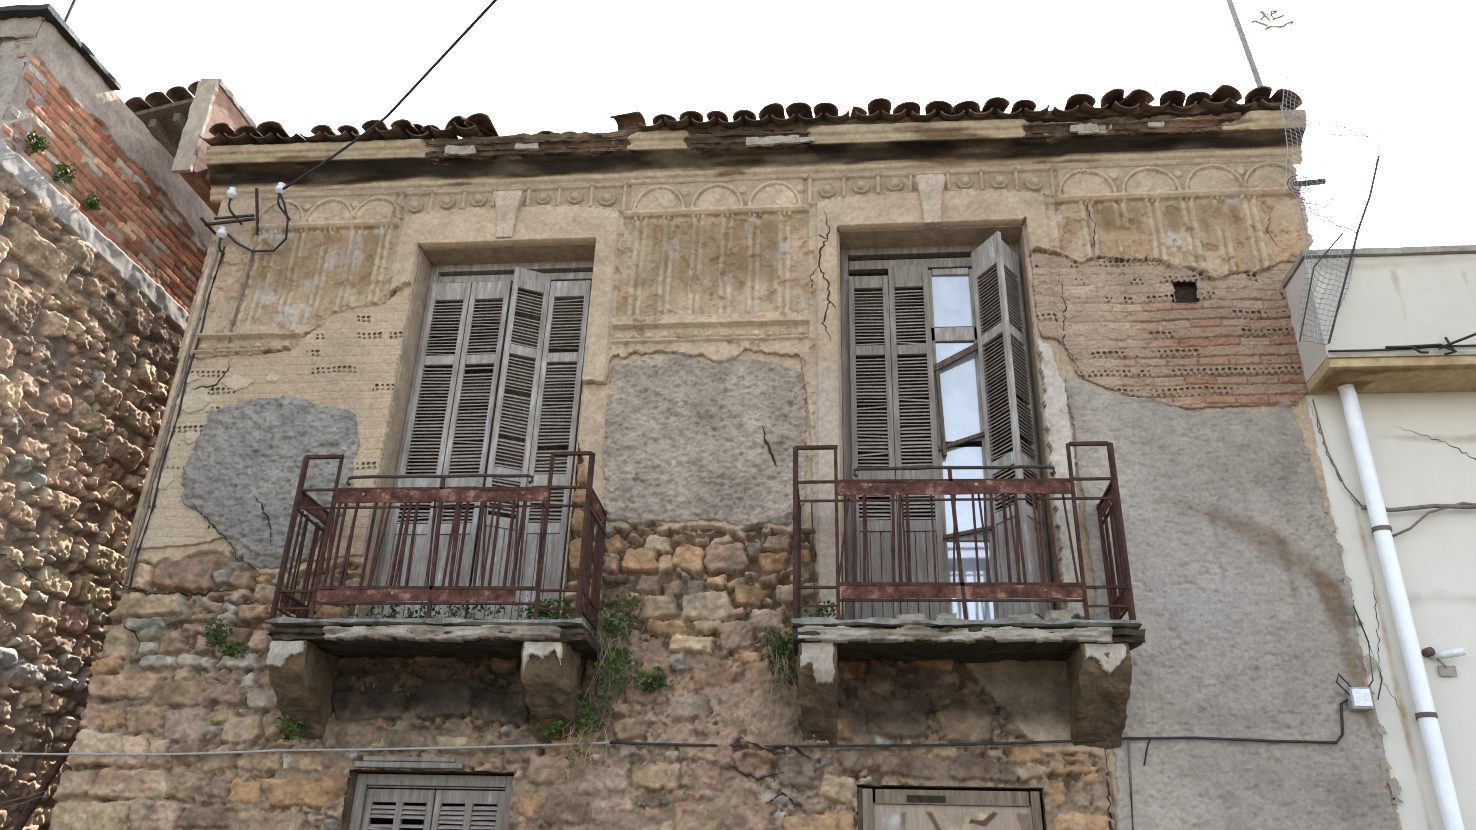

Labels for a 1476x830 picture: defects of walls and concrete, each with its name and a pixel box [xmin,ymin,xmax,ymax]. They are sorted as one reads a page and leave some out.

peeling [444,145,476,156]
peeling [515,142,539,151]
peeling [746,135,815,147]
crack [810,212,836,340]
flaking render [1030,249,1307,410]
flaking render [136,279,415,562]
crack [0,554,51,591]
damp [1317,577,1341,621]